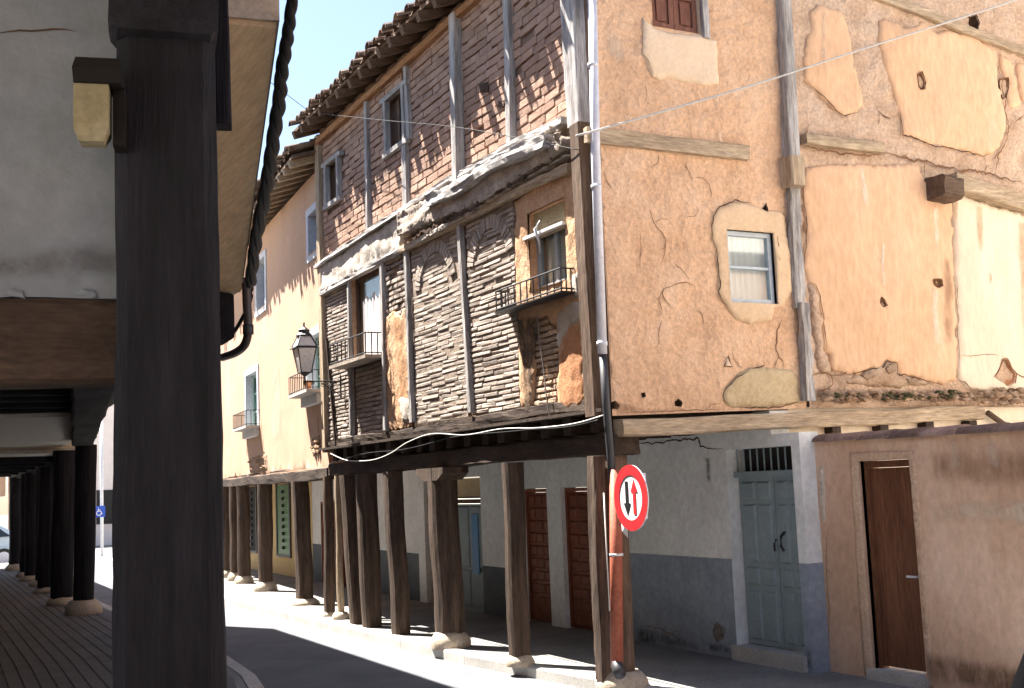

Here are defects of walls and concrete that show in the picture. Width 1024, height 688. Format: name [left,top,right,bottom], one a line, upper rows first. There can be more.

spalling [968,15,980,29]
crack [619,51,1024,413]
peeling [532,319,584,417]
peeling [846,361,931,389]
spalling [995,358,1017,386]
crack [639,437,721,450]